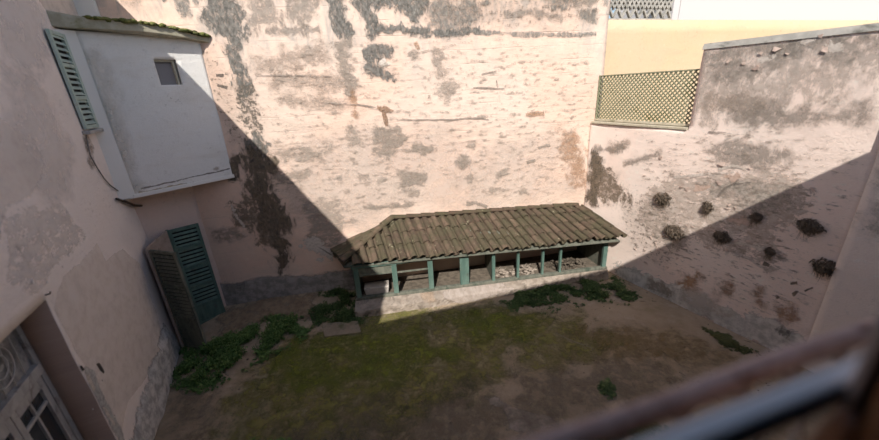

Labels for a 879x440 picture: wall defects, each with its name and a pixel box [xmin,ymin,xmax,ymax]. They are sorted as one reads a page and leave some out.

leakage [695,34,879,129]
leakage [175,0,609,306]
leakage [584,141,632,209]
leakage [708,136,790,169]